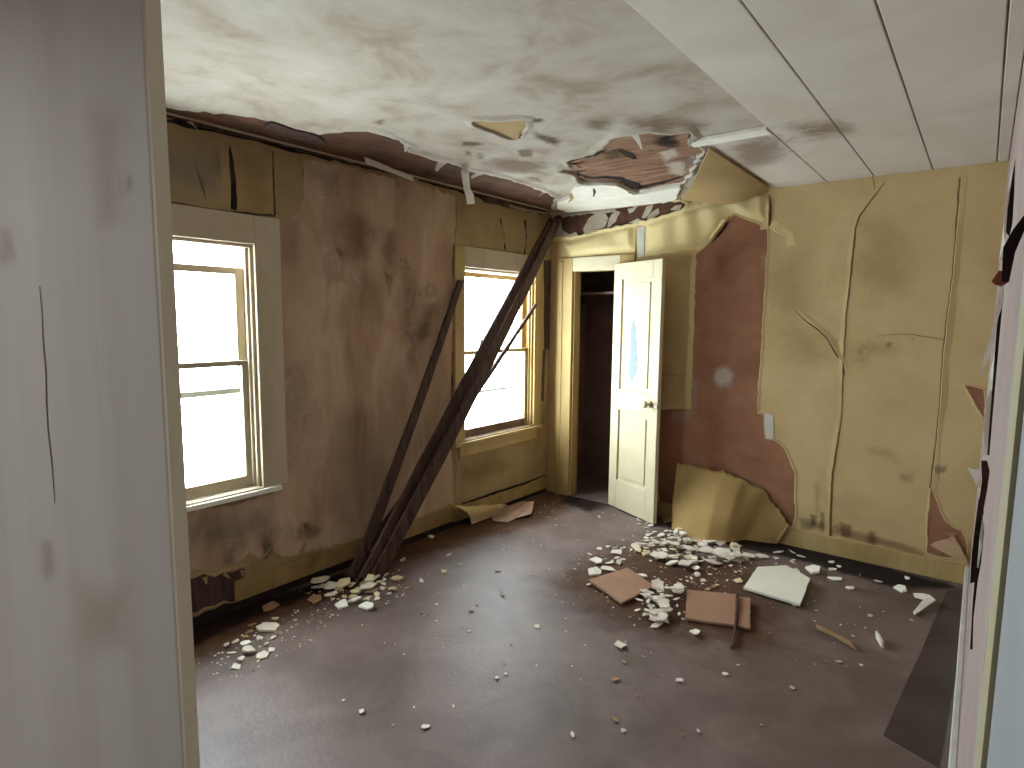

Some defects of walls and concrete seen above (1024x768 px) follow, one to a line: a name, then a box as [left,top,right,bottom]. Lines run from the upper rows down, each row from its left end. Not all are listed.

crack [195,143,237,210]
flaking render [166,104,709,241]
damp [657,136,685,175]
crack [794,305,850,375]
crack [39,286,55,503]
spalling [190,561,252,617]